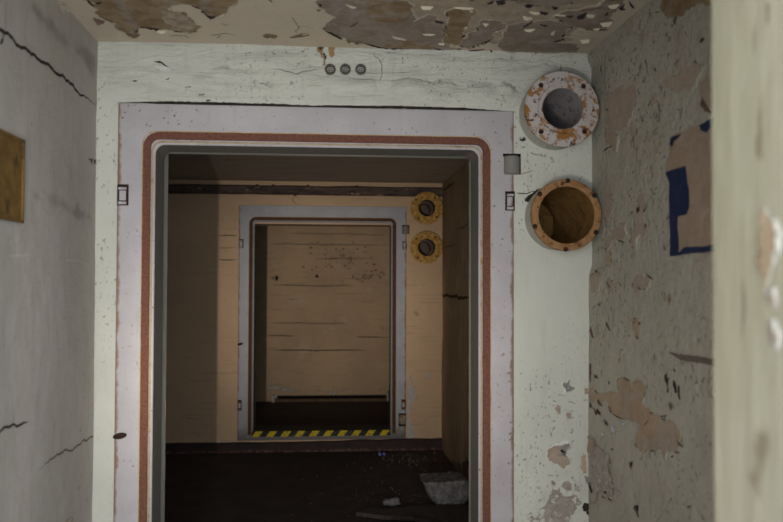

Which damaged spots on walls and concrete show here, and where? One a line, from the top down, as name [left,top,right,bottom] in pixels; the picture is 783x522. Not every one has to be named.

peeling [85,0,240,38]
peeling [313,0,634,55]
peeling [655,0,711,24]
crack [0,22,97,105]
crack [442,292,469,300]
crack [668,351,714,367]
peeling [561,363,684,461]
crack [40,436,94,469]
spalling [530,435,615,522]